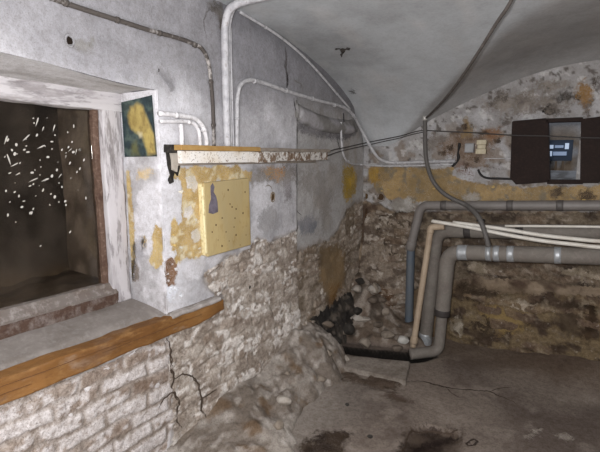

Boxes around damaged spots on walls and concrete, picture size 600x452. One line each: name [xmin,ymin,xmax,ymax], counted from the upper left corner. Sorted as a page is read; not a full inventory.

crack [284,48,303,111]
leakage [475,76,595,126]
spalling [0,164,600,452]
crack [159,338,217,428]
crack [408,381,516,404]
leakage [294,428,353,452]